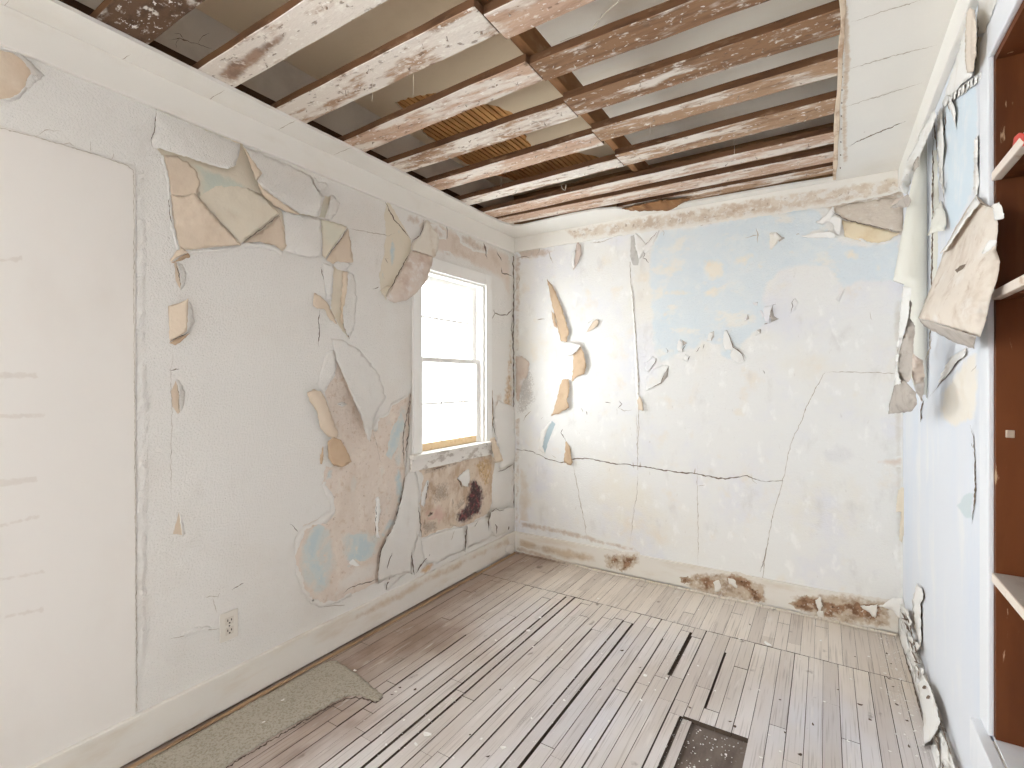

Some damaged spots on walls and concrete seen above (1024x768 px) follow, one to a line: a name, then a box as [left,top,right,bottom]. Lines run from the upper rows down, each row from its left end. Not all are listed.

damp [405,212,640,567]
crack [517,268,894,578]
peeling [645,192,904,391]
peeling [786,592,955,768]